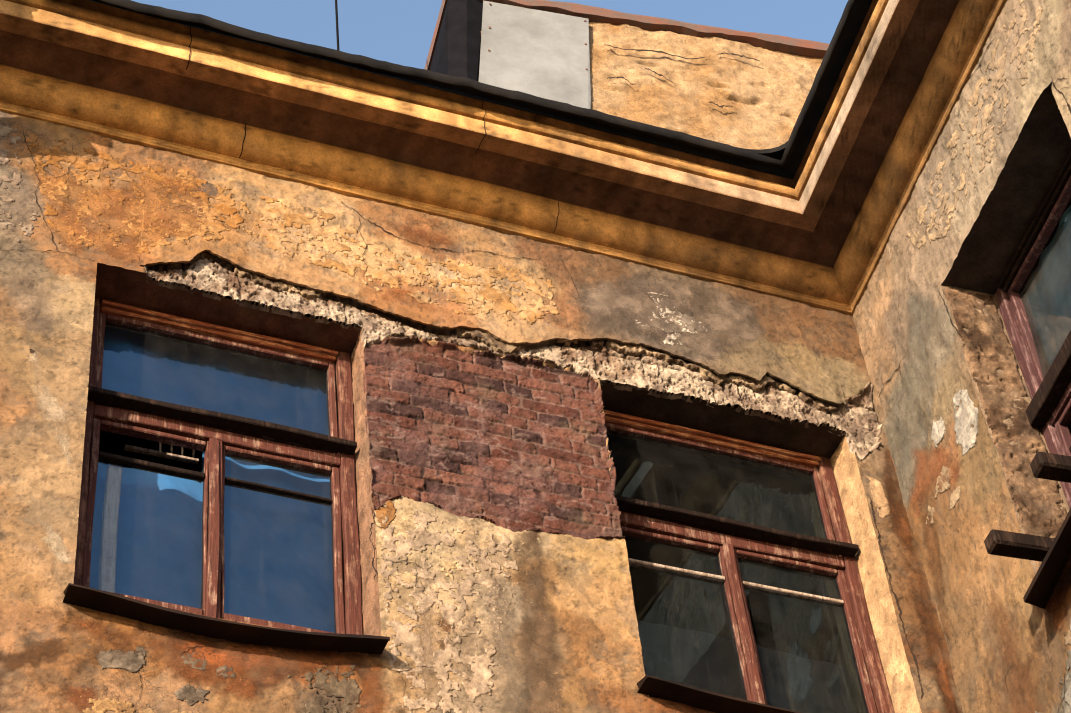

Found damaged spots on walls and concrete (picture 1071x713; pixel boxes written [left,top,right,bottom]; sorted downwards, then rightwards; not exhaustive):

crack [604,44,760,85]
crack [3,130,95,261]
flaking render [0,125,883,713]
spalling [931,287,1067,538]
peeling [866,475,890,518]
peeling [925,466,961,526]
damp [420,611,434,685]
damp [486,530,562,713]
peeling [1059,614,1071,713]